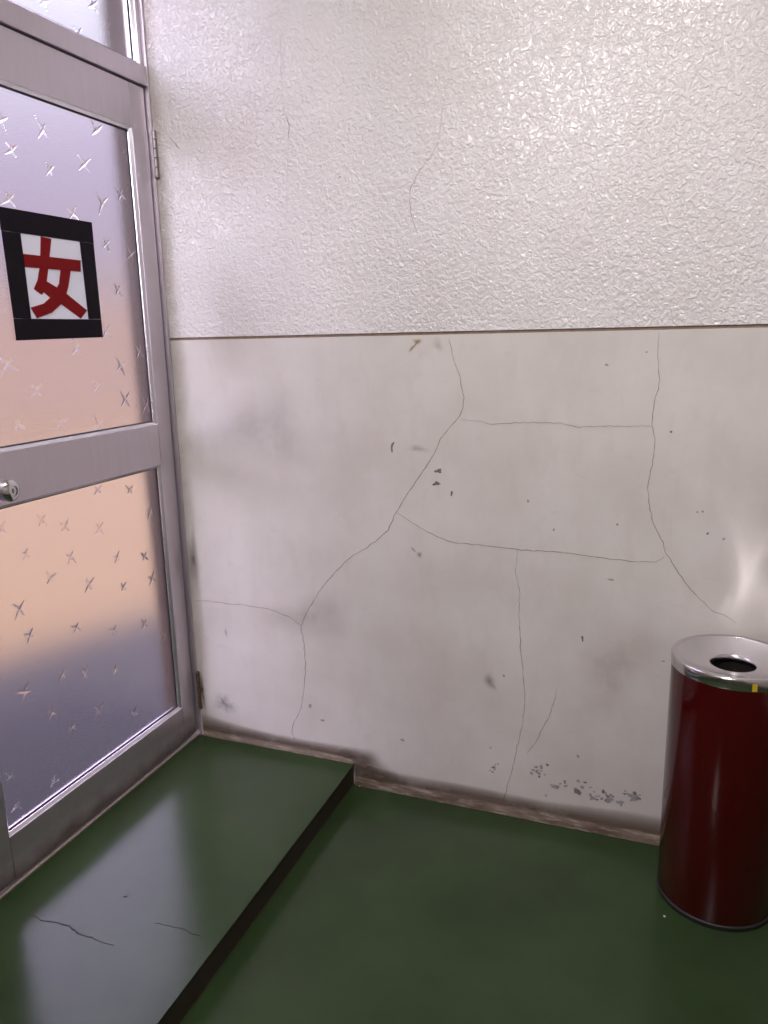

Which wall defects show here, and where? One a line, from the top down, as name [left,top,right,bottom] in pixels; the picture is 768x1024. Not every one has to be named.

crack [197,332,736,798]
water stain [203,721,660,835]
peeling [530,764,642,806]
crack [31,915,112,945]